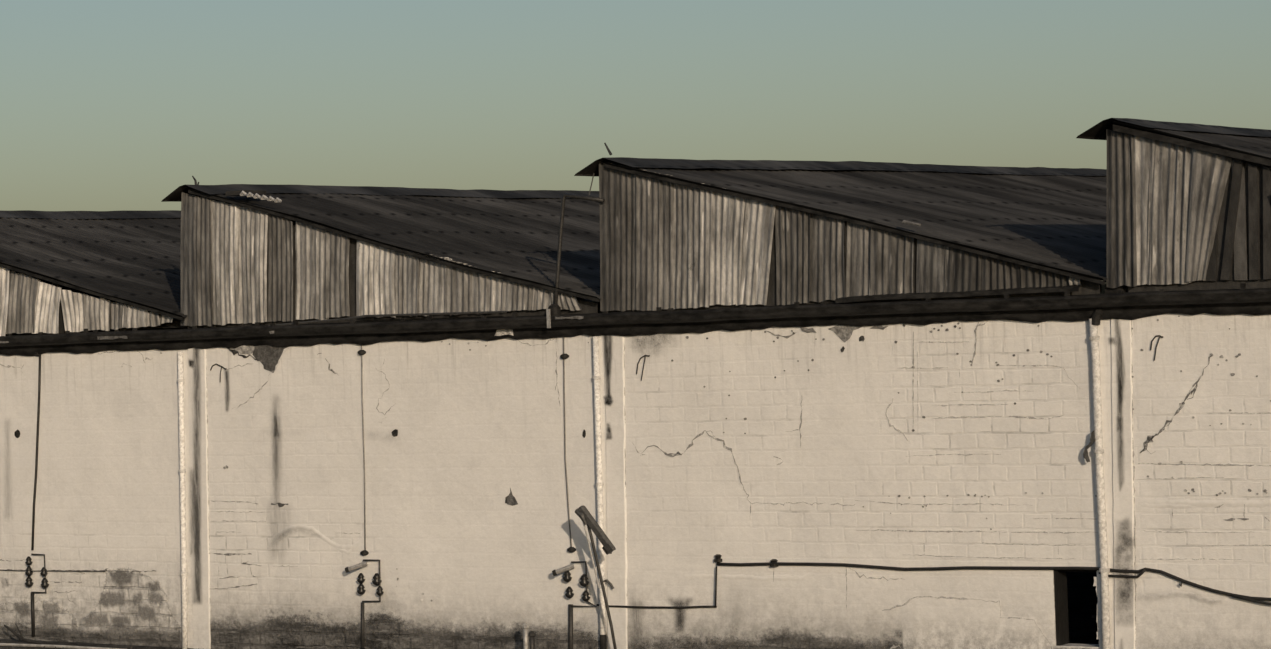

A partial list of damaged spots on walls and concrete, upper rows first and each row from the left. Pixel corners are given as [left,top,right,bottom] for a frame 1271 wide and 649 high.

flaking render [227,331,291,374]
crack [774,401,802,465]
crack [634,430,1098,608]
crack [1138,355,1271,560]